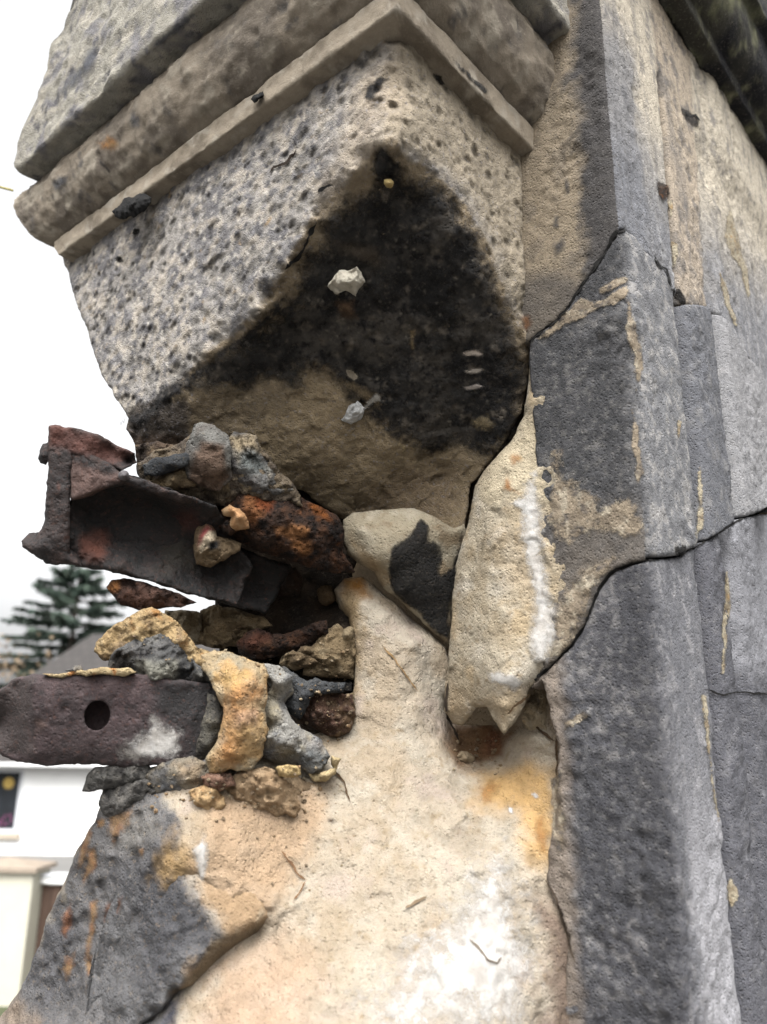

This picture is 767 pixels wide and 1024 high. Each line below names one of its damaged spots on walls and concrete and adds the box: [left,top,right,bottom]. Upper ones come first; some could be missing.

crack [529,229,625,342]
crack [655,256,672,285]
rust [107,578,197,610]
rust [219,511,238,536]
damp [514,473,555,659]
crack [444,369,767,773]
spalling [0,577,588,1024]